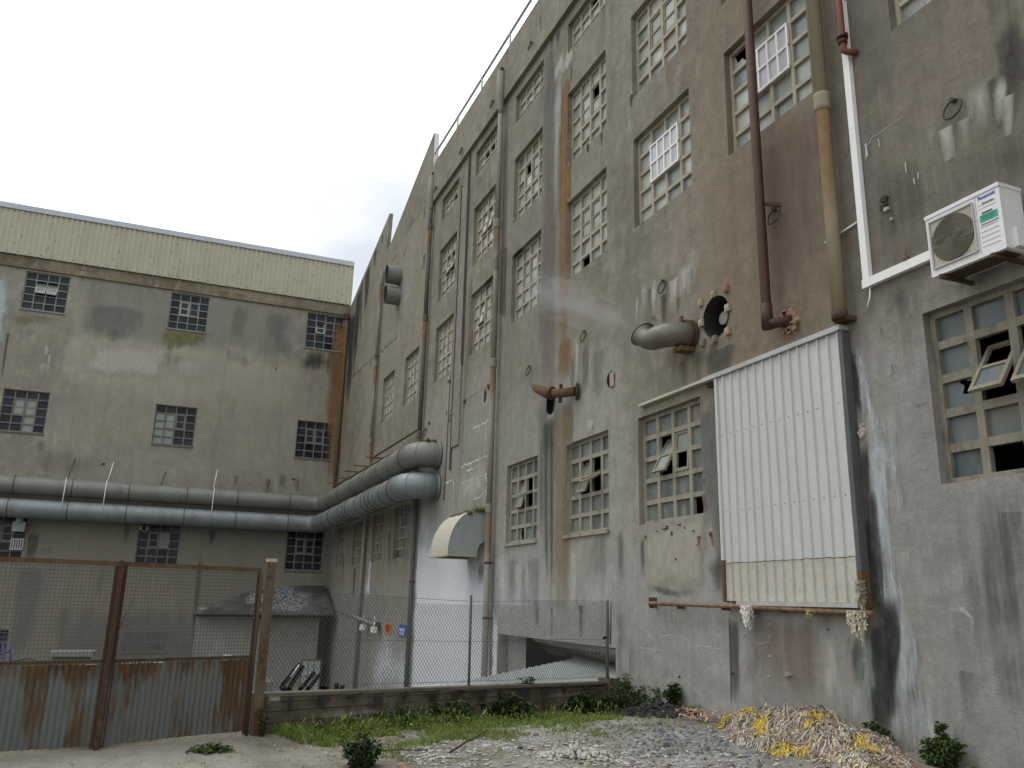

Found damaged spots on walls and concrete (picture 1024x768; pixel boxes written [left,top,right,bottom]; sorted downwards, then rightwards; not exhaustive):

corrosion [559,80,570,370]
corrosion [328,326,349,467]
water stain [851,354,914,733]
water stain [920,713,935,738]